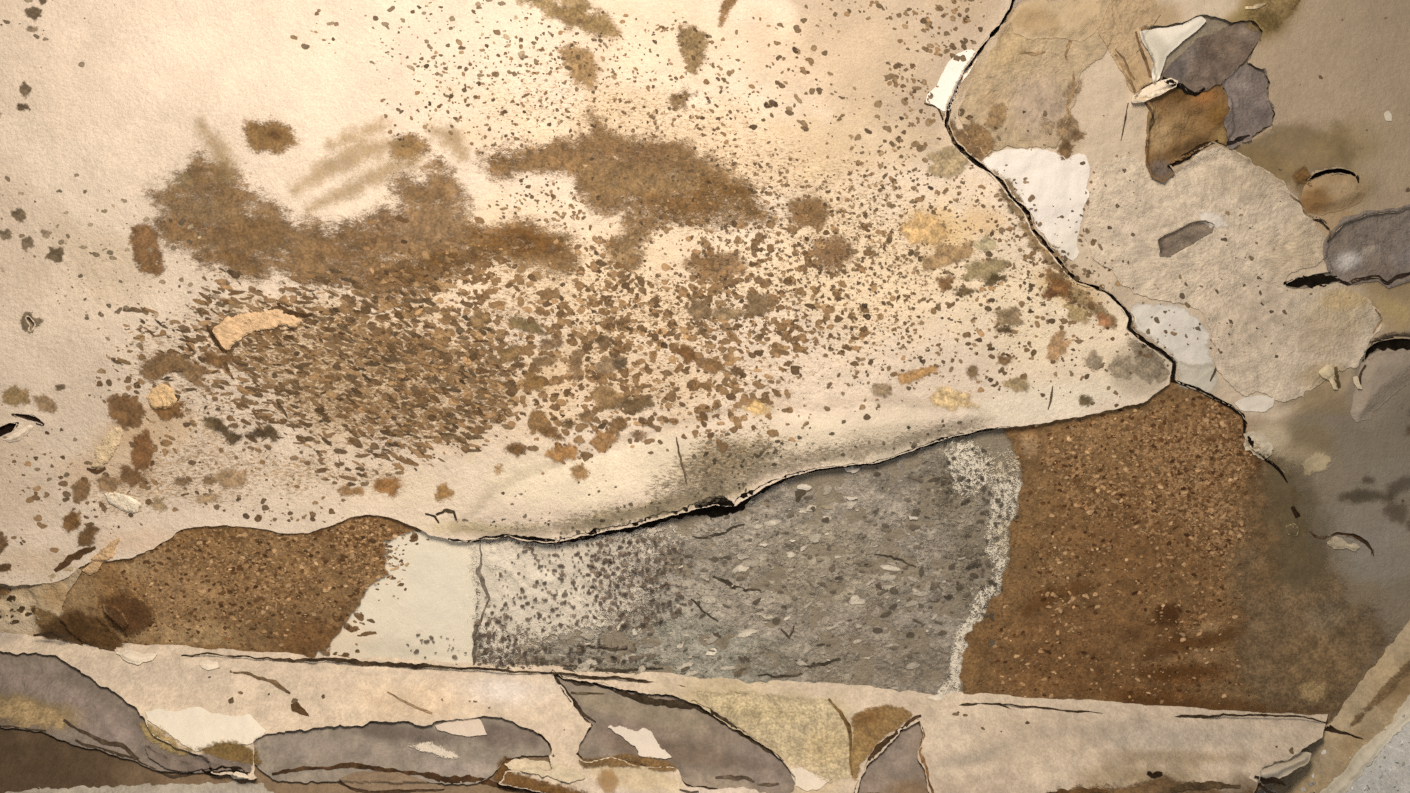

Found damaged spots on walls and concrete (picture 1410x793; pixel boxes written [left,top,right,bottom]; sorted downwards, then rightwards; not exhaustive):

peeling [926,0,1410,412]
crack [924,0,1374,556]
damp [1209,208,1287,326]
damp [0,0,1250,700]
flaking render [87,427,123,474]
crack [425,426,1010,545]
peeling [1243,431,1273,460]
peeling [1301,452,1331,476]
spalling [0,438,1004,793]
spalling [1047,752,1321,793]